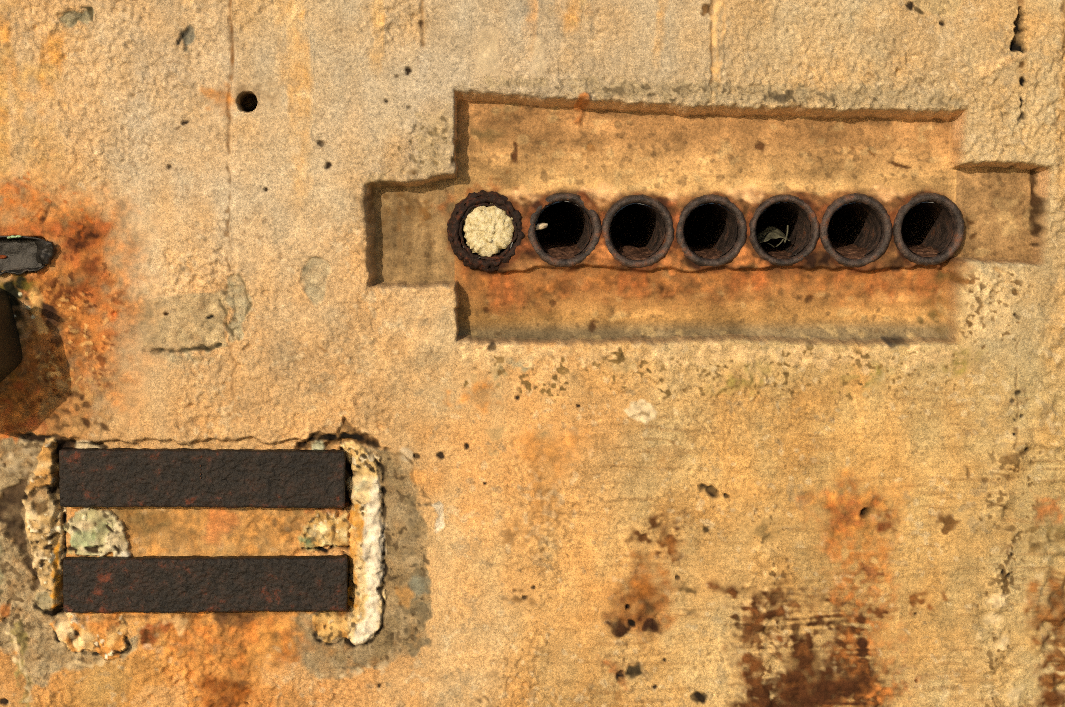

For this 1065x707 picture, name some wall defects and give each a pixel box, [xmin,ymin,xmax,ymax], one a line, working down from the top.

corrosion [0,0,172,441]
corrosion [432,174,530,261]
corrosion [432,237,980,322]
water stain [878,261,970,349]
spalling [0,476,40,593]
spalling [7,431,110,449]
corrosion [105,507,312,557]
spalling [291,415,446,535]
corrosion [593,506,693,707]
corrosion [702,459,930,707]
corrosion [1007,488,1065,707]